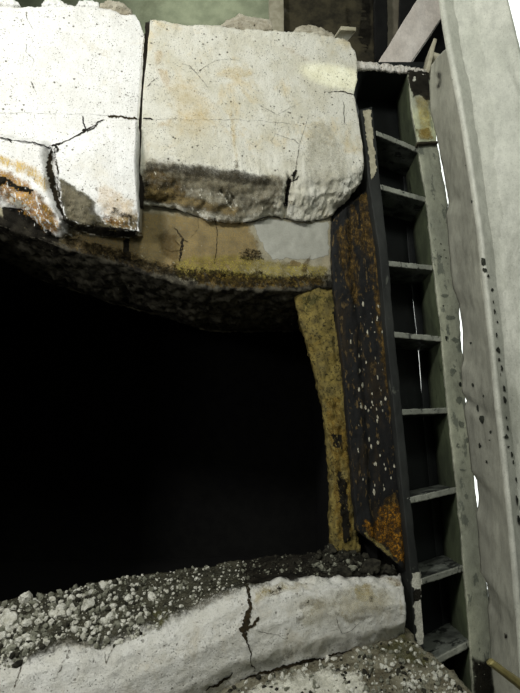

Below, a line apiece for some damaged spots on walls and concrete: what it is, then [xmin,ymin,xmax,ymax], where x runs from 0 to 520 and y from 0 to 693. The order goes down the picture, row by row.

corrosion [0,155,59,242]
crack [0,22,324,264]
corrosion [337,192,388,389]
corrosion [327,398,352,543]
corrosion [362,492,405,562]
crack [206,583,358,691]